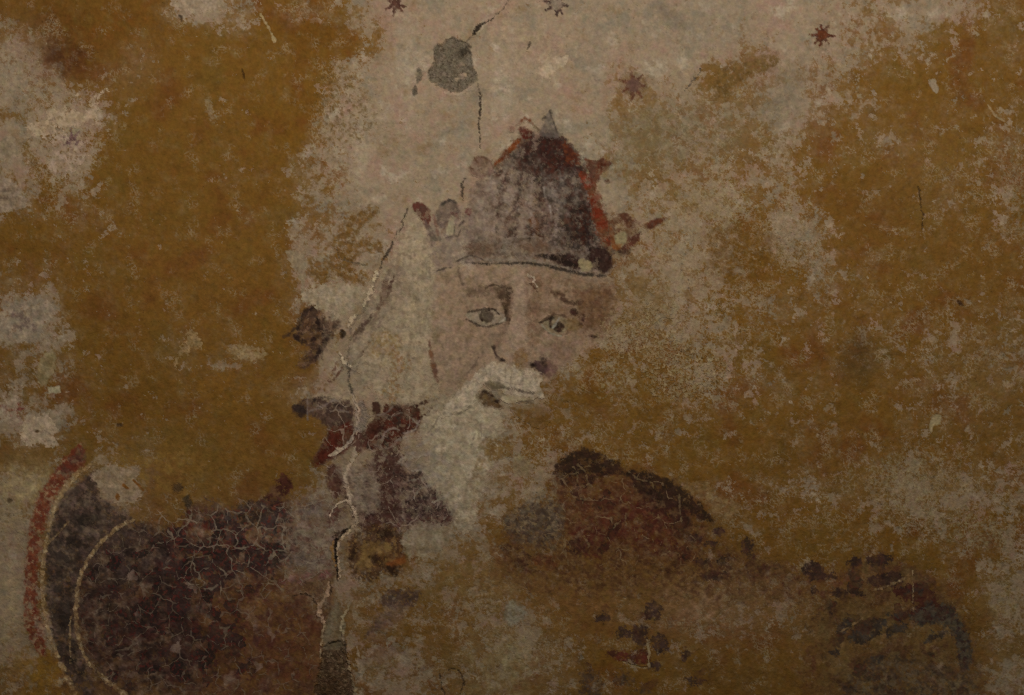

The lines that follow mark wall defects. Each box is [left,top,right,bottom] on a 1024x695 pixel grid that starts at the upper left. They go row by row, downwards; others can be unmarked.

crack [466,0,509,42]
damp [708,48,782,105]
crack [475,80,485,149]
damp [704,219,779,292]
damp [831,322,881,390]
crack [78,208,452,695]